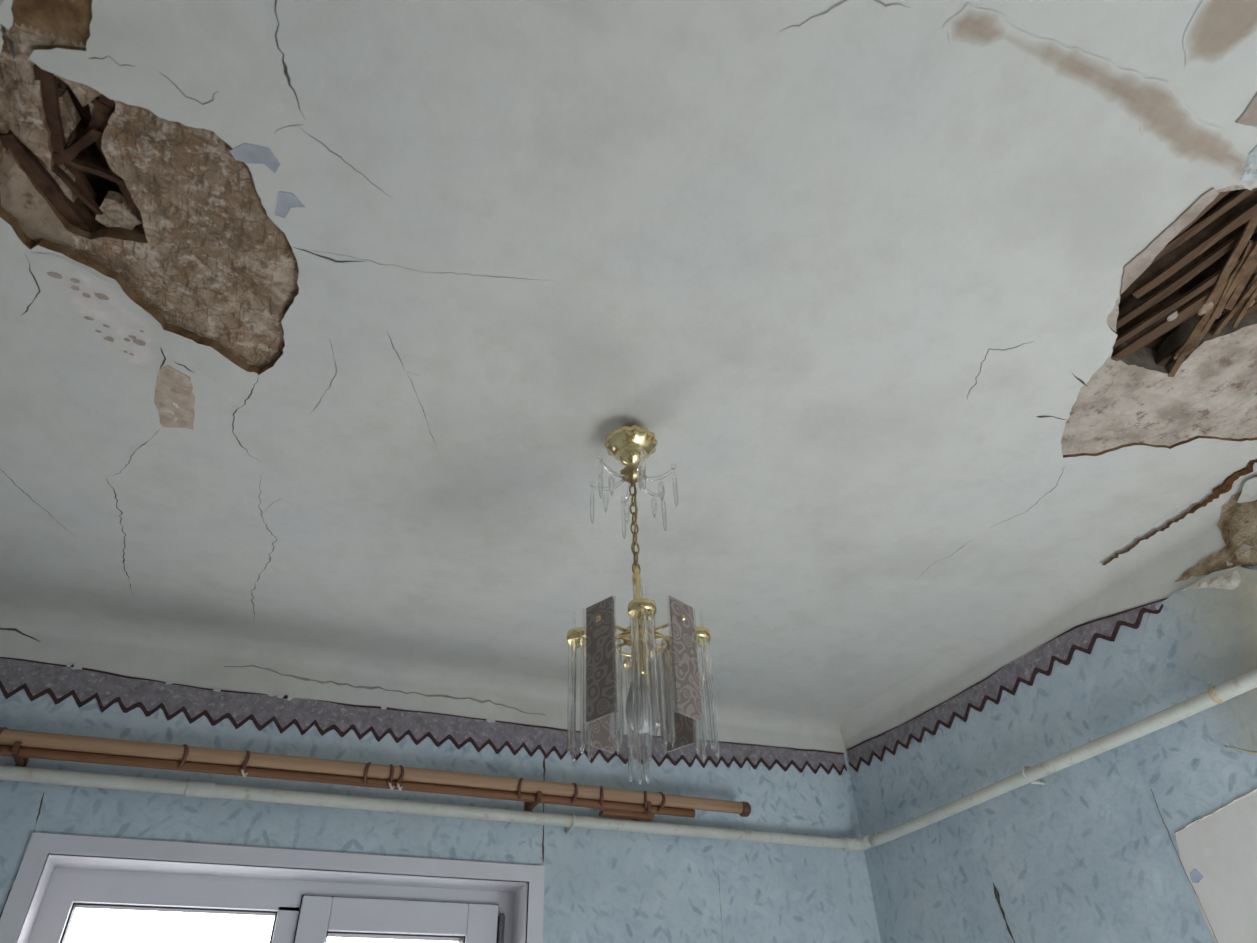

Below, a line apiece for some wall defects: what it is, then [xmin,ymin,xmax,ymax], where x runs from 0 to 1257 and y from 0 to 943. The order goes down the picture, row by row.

crack [266,0,389,196]
leakage [943,0,1257,190]
peeling [1234,92,1257,128]
crack [22,253,41,315]
spalling [0,77,285,430]
spalling [1108,145,1257,374]
crack [227,372,283,620]
spalling [1063,436,1257,458]
peeling [1237,477,1257,503]
crack [0,628,40,642]
crack [224,665,544,715]
peeling [1175,788,1257,943]